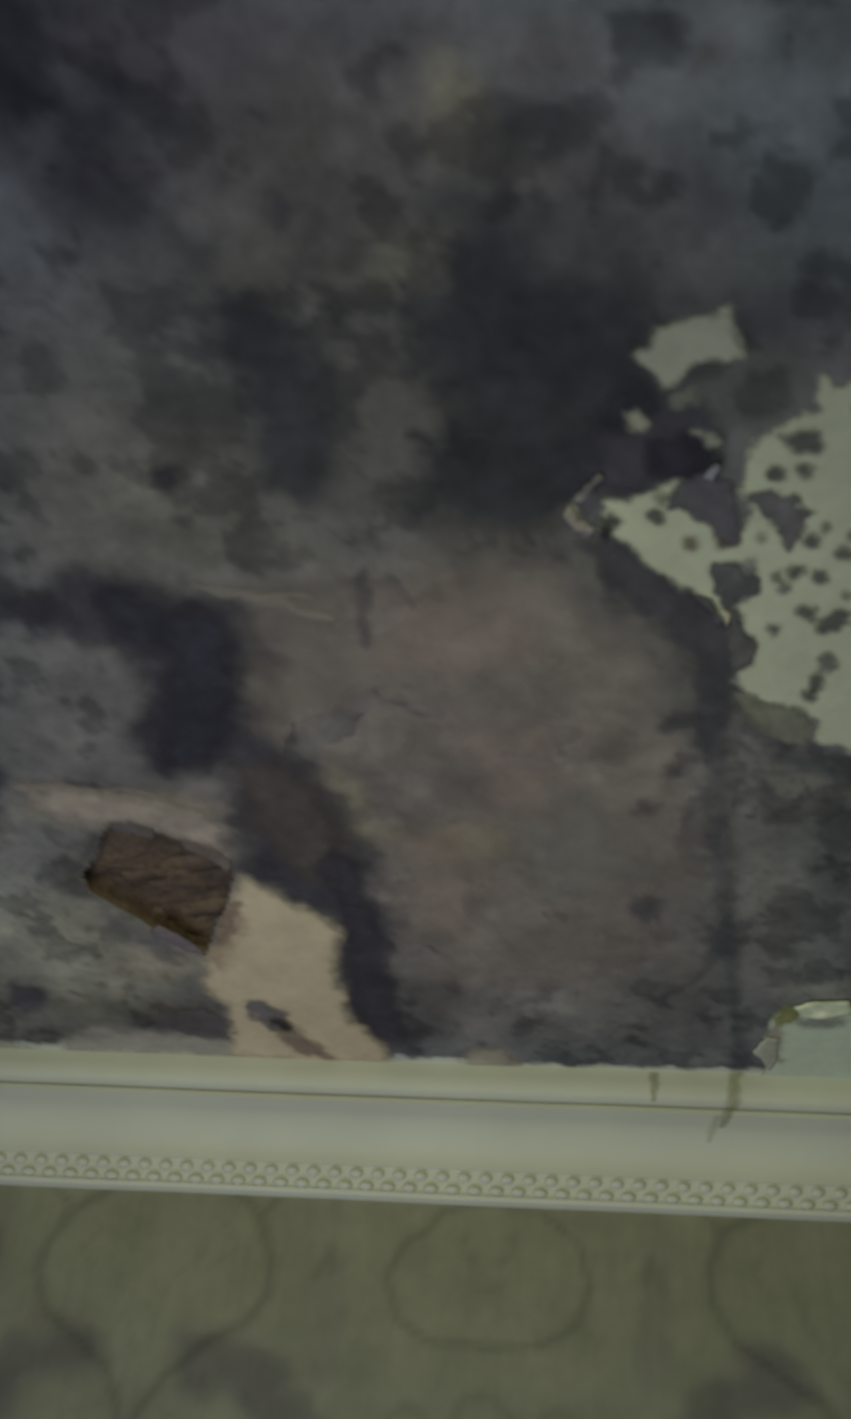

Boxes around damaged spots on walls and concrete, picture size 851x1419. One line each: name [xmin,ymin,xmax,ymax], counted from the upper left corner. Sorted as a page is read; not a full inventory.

peeling [635,307,745,387]
leakage [0,0,851,1070]
peeling [564,375,851,753]
peeling [31,786,387,1062]
peeling [753,1001,851,1079]